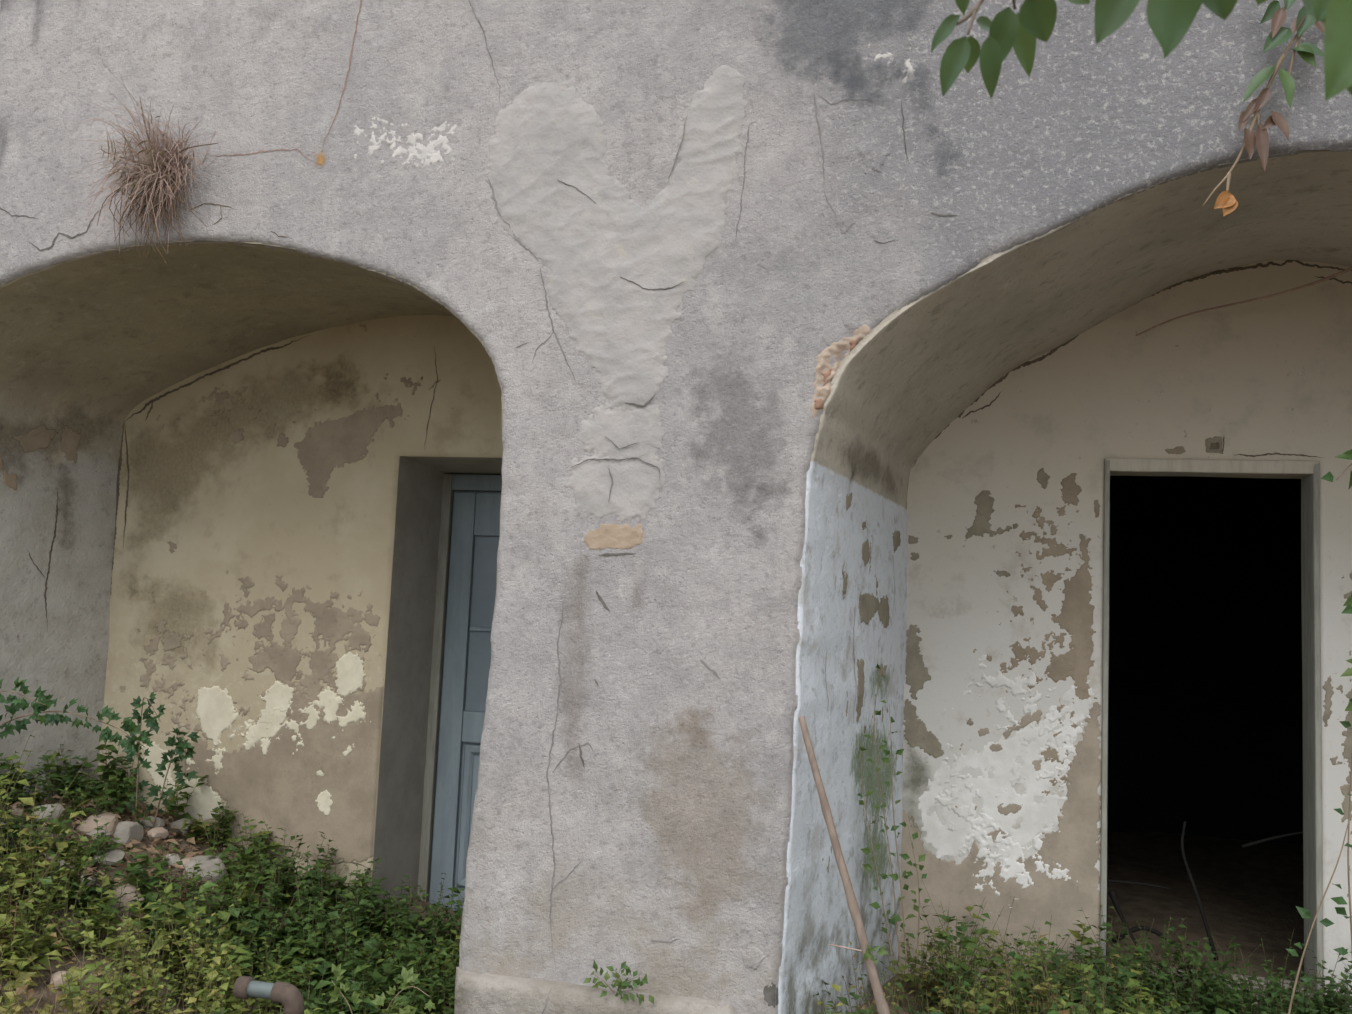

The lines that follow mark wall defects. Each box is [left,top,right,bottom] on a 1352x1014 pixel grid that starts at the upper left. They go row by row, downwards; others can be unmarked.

crack [218,0,362,162]
peeling [353,109,467,176]
crack [1148,260,1352,298]
crack [110,337,304,596]
flaking render [275,373,440,498]
crack [911,335,1079,468]
crack [27,491,58,632]
flaking render [842,521,890,628]
flaking render [137,574,384,863]
flaking render [846,658,888,739]
flaking render [864,467,1102,981]
crack [542,599,596,1014]